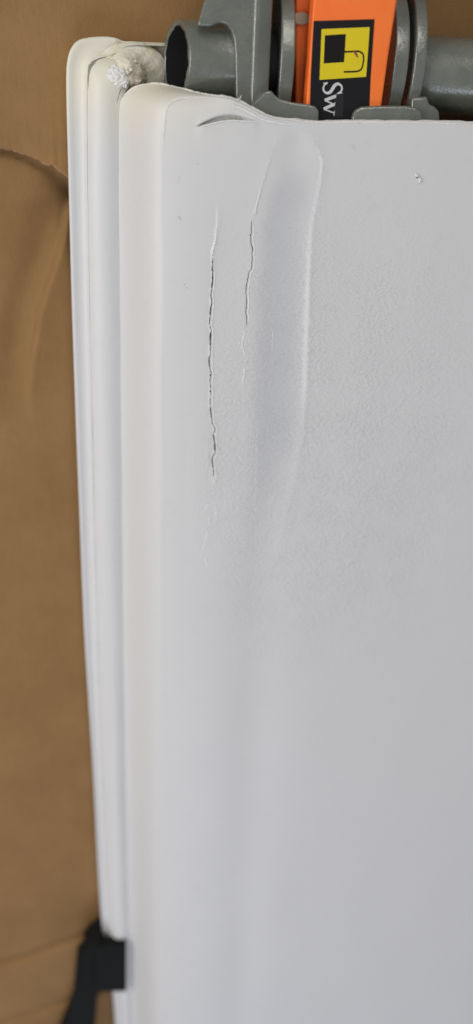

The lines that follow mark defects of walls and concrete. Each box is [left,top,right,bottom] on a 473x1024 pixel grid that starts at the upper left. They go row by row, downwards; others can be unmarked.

crack [203,173,266,569]